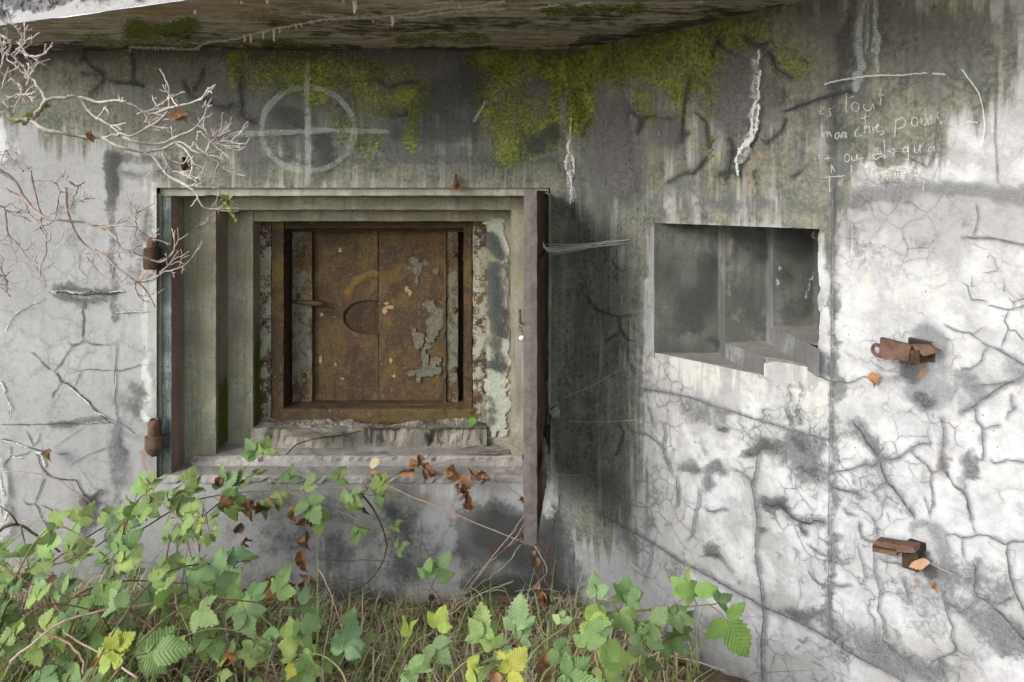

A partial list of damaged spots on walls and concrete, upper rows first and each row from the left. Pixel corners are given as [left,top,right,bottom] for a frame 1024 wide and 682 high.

water stain [103,152,132,203]
water stain [527,118,575,219]
water stain [711,49,781,177]
water stain [853,165,1024,204]
crack [0,257,148,532]
spalling [250,217,511,455]
crack [586,189,1024,682]
water stain [465,500,575,599]